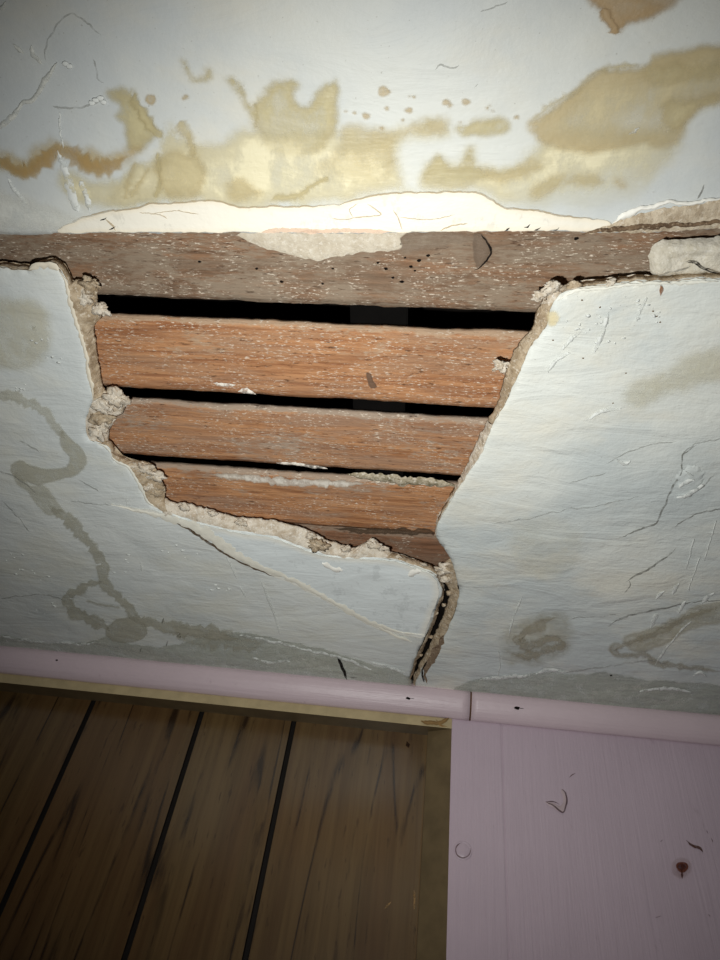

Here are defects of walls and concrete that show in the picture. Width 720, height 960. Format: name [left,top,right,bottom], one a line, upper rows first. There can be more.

leakage [0,81,400,207]
leakage [424,47,720,199]
peeling [57,112,720,537]
leakage [0,432,411,686]
peeling [0,258,451,642]
crack [409,559,459,685]
crack [623,447,713,537]